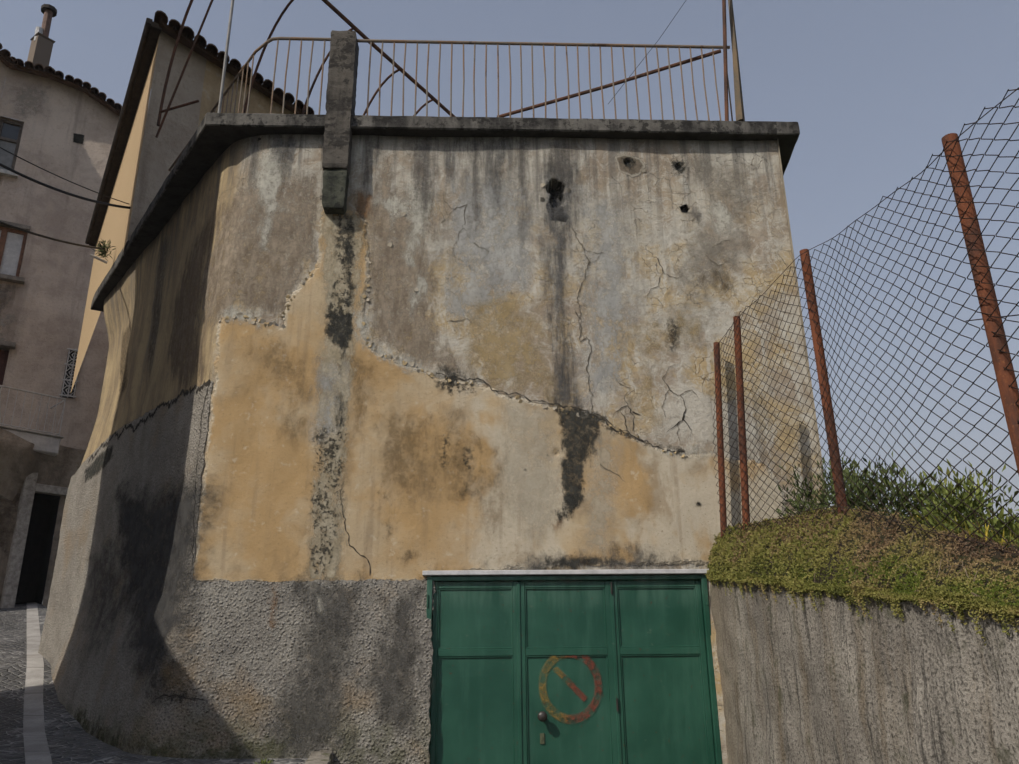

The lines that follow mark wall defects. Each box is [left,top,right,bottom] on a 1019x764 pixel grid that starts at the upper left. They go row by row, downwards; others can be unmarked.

peeling [353,160,474,384]
crack [441,193,488,262]
spalling [540,182,571,222]
damp [546,145,572,312]
crack [436,228,705,456]
flaking render [615,154,646,178]
damp [274,193,370,758]
damp [556,365,607,522]
damp [89,482,208,701]